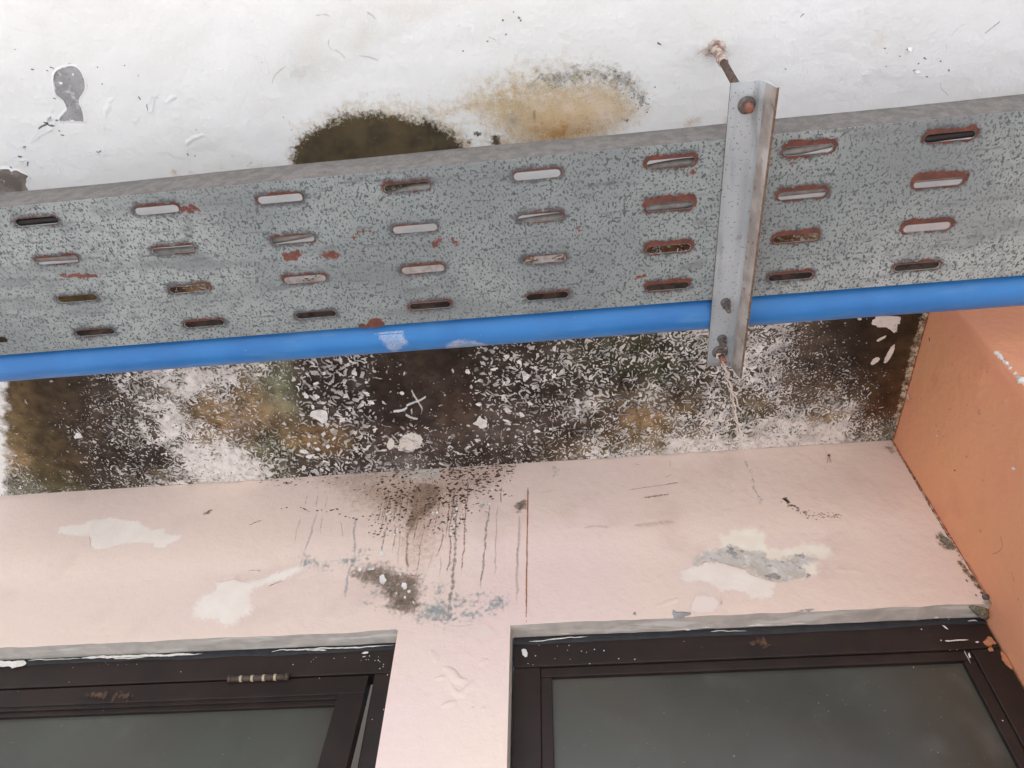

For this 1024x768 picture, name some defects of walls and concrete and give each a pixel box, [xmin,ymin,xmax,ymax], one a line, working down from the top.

water stain [243,0,661,165]
peeling [0,63,88,193]
water stain [384,182,423,191]
water stain [58,294,97,302]
water stain [170,284,210,293]
water stain [402,265,444,274]
water stain [646,244,691,253]
water stain [773,233,818,243]
water stain [0,313,923,631]
peeling [48,513,200,558]
peeling [668,524,834,618]
peeling [162,565,306,636]